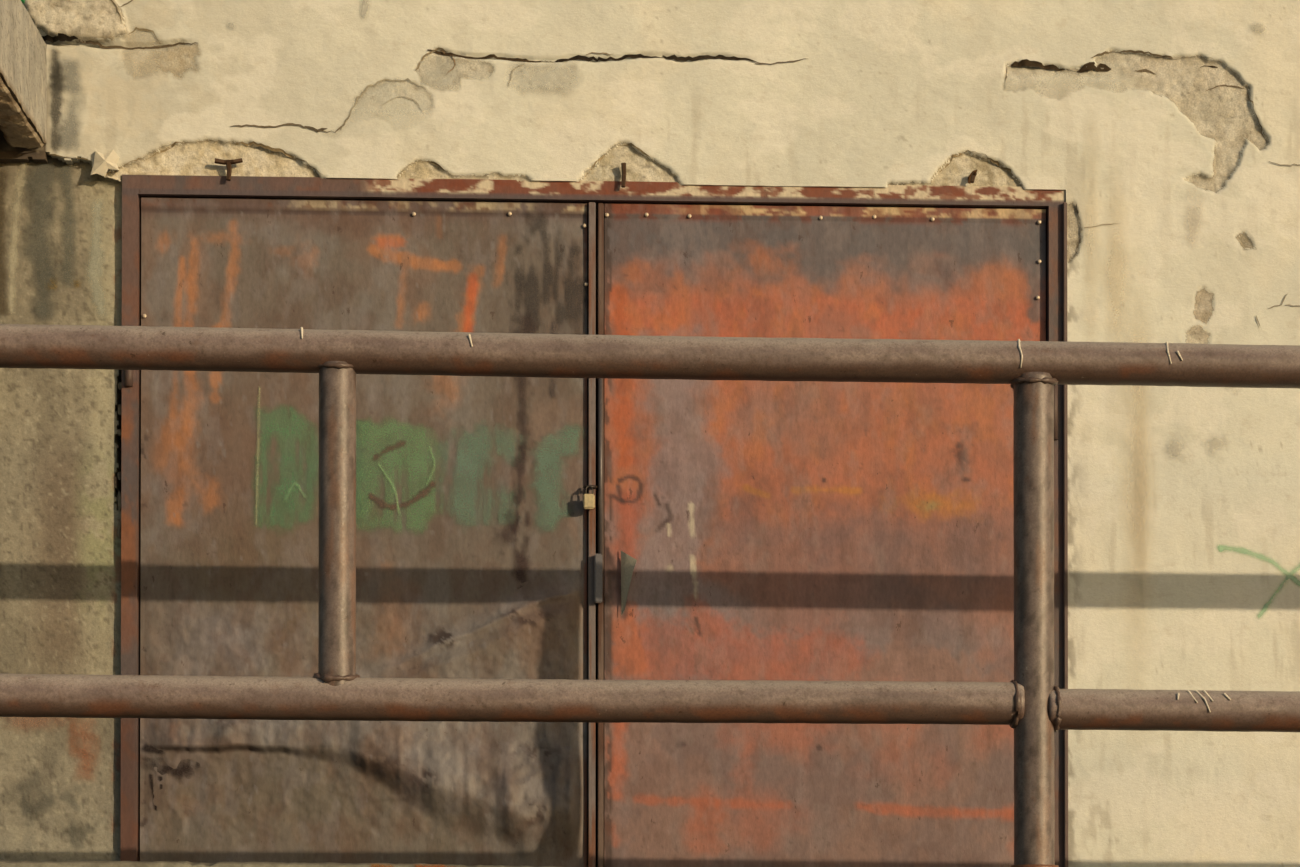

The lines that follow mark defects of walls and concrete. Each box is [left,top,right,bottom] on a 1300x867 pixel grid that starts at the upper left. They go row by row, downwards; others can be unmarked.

crack [427,49,806,72]
flaking render [0,77,321,181]
crack [230,116,350,133]
flaking render [1005,50,1269,193]
leakage [0,50,79,318]
flaking render [579,143,679,183]
flaking render [888,150,1022,187]
leakage [516,246,587,334]
flaking render [1186,289,1214,344]
corrosion [144,745,199,810]